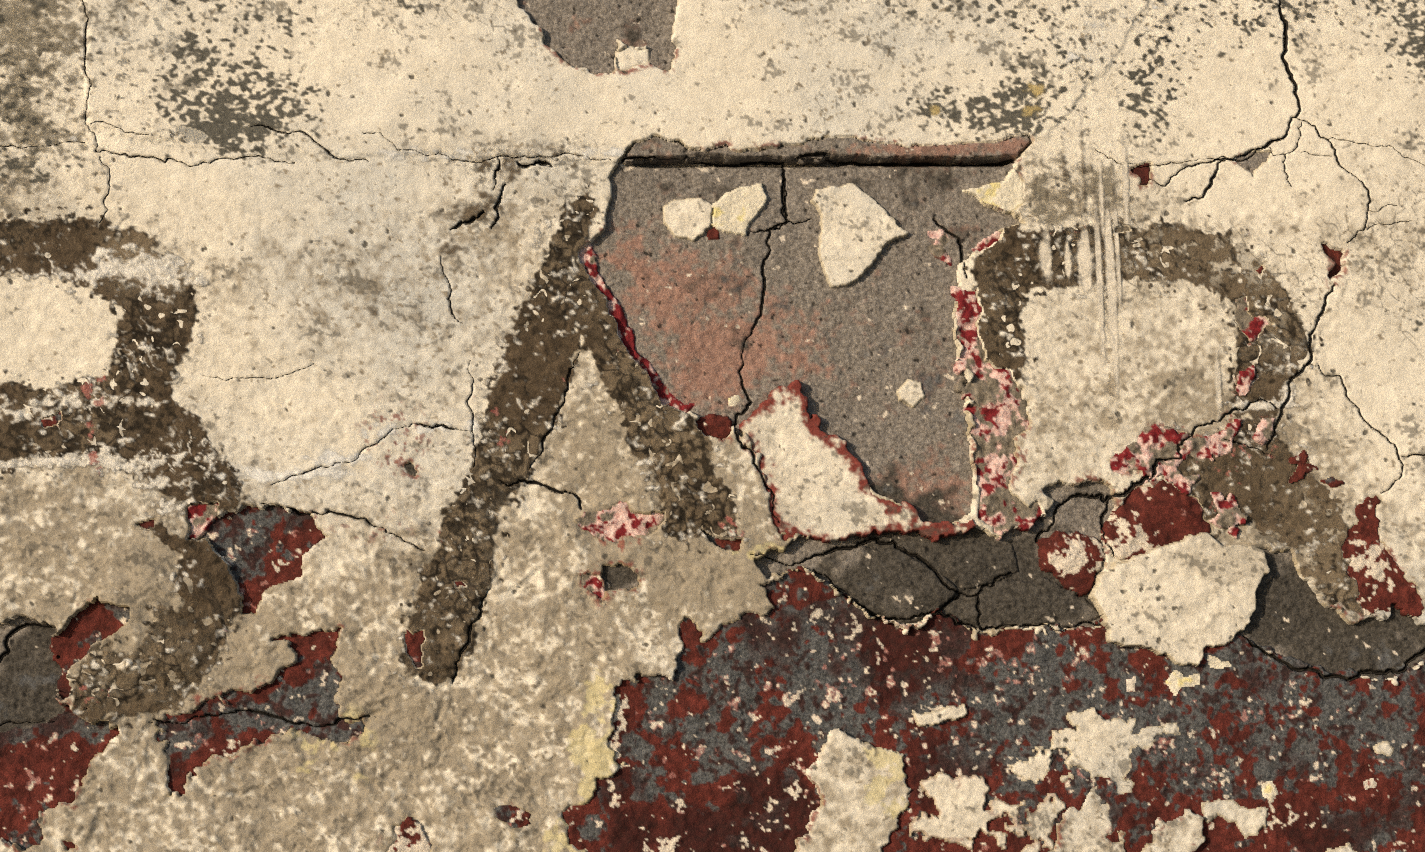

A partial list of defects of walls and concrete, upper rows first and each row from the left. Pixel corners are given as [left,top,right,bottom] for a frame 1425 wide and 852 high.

spalling [517,0,677,74]
crack [1095,0,1425,243]
crack [0,0,1013,550]
peeling [0,598,130,850]
peeling [187,502,325,614]
peeling [151,628,375,796]
peeling [405,629,425,668]
crack [758,538,1094,631]
peeling [562,135,1425,852]
crack [1036,284,1425,557]
crack [1243,636,1425,681]
peeling [388,816,432,852]